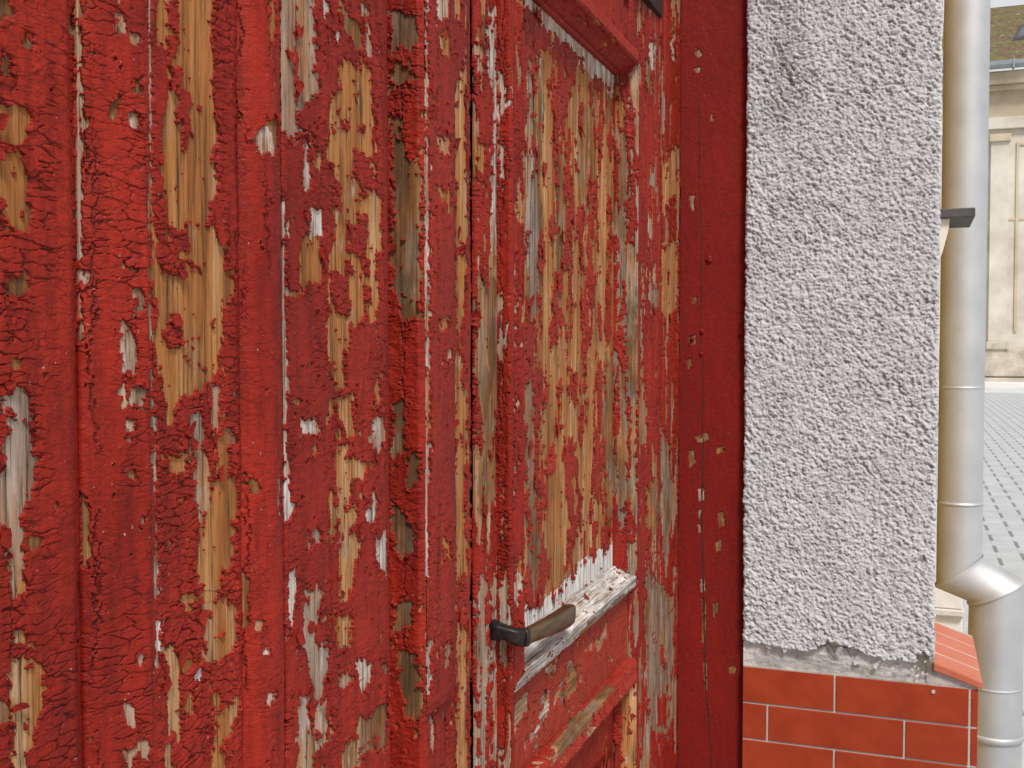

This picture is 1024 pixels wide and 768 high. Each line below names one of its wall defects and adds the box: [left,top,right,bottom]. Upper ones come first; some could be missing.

peeling [0,0,13,27]
peeling [0,103,40,232]
peeling [68,0,94,340]
peeling [661,142,696,216]
peeling [3,262,29,302]
peeling [108,0,268,768]
peeling [245,0,679,768]
peeling [0,358,52,600]
peeling [80,491,94,571]
peeling [0,630,50,768]
flaking render [835,647,881,669]
spalling [894,653,933,677]